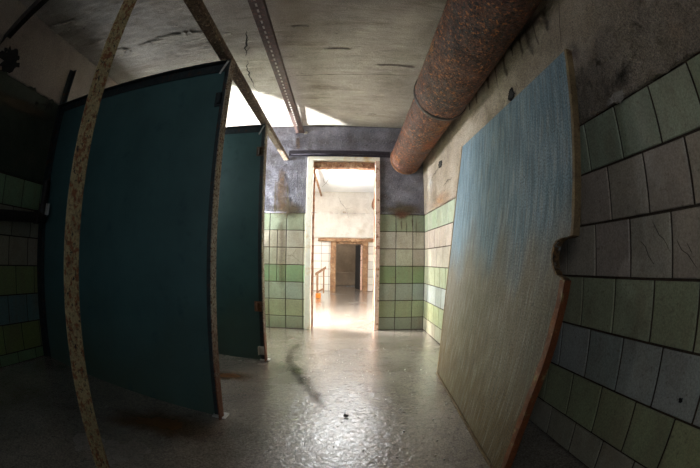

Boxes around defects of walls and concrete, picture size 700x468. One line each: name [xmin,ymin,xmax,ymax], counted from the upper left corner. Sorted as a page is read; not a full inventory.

crack [244,31,273,101]